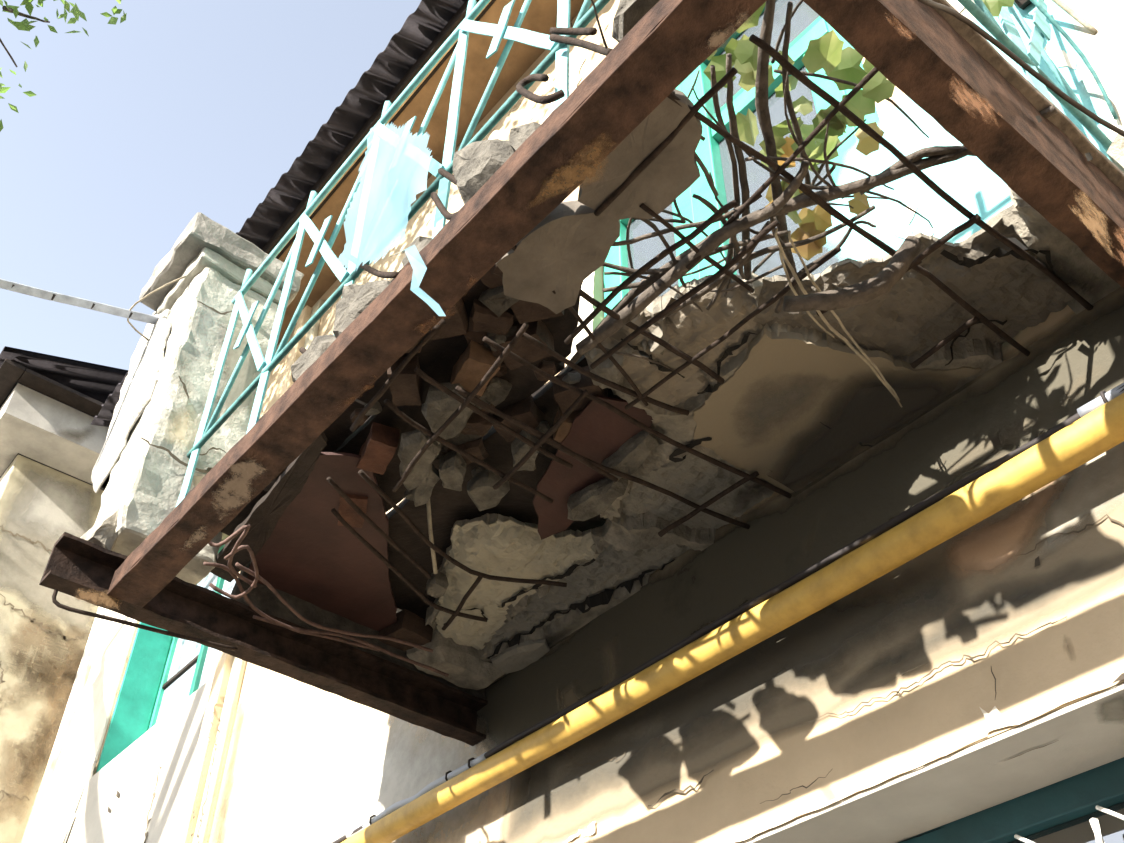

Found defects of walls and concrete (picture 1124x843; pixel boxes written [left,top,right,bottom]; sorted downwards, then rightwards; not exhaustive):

corrosion [952,78,995,120]
corrosion [1072,193,1124,260]
flaking render [327,27,1094,650]
peeling [212,460,266,519]
leakage [476,258,1124,750]
corrosion [76,589,120,608]
leakage [501,471,1124,843]
crack [817,616,1067,719]
crack [0,790,38,801]
leakage [21,654,92,843]
crack [144,764,162,843]
peeling [725,673,1124,843]